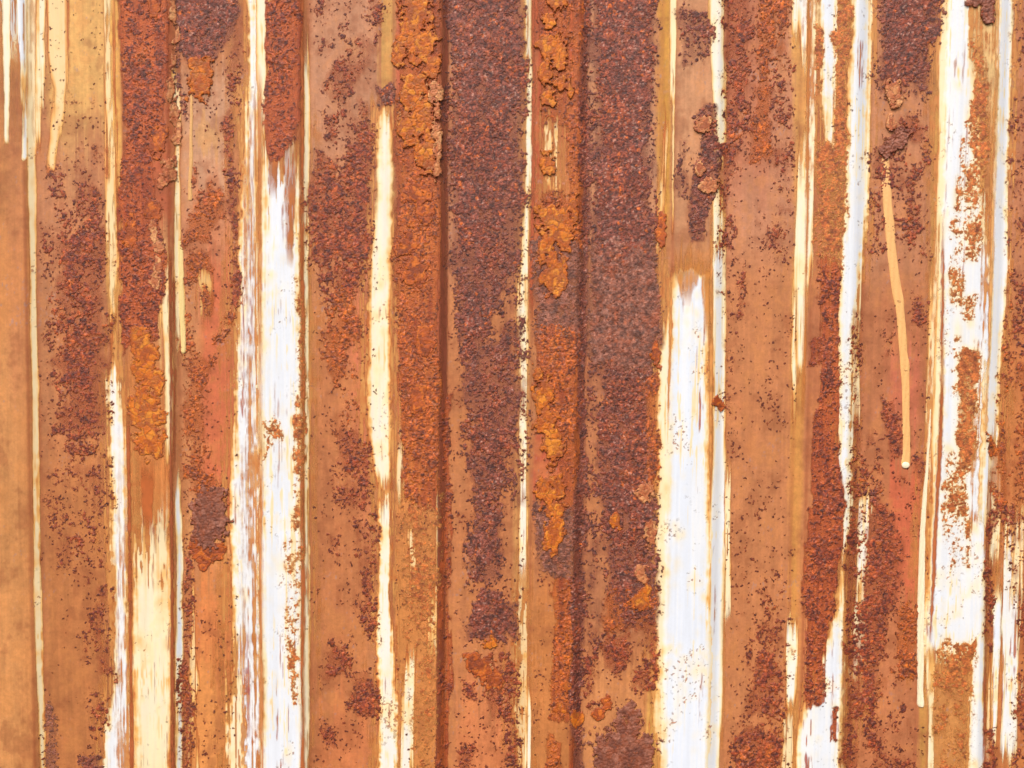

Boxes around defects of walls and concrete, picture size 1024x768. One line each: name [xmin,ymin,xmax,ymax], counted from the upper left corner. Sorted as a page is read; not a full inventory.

corrosion [38,0,262,768]
corrosion [258,0,1024,768]